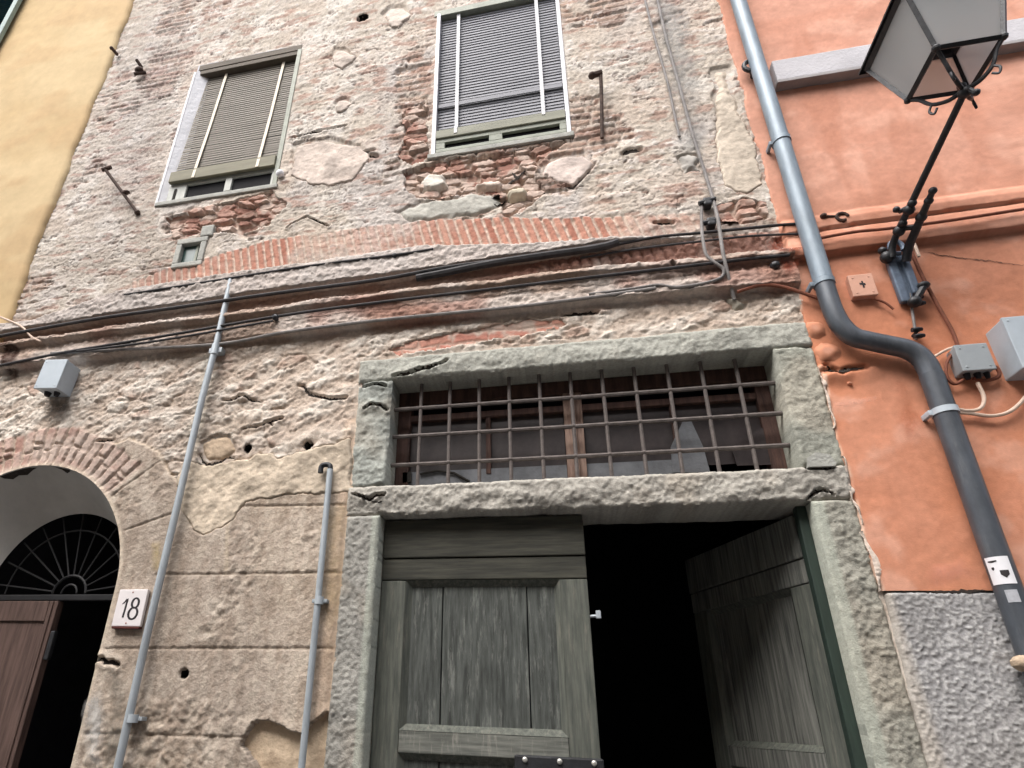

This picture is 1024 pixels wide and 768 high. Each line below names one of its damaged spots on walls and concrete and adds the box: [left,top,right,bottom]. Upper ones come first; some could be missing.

flaking render [398,102,594,218]
flaking render [166,193,287,240]
crack [226,395,283,430]
crack [299,361,447,411]
flaking render [817,367,836,428]
crack [824,365,865,373]
crack [354,493,385,503]
crack [808,467,833,499]
spalling [806,452,882,592]
crack [100,657,120,666]
flaking render [244,713,329,768]